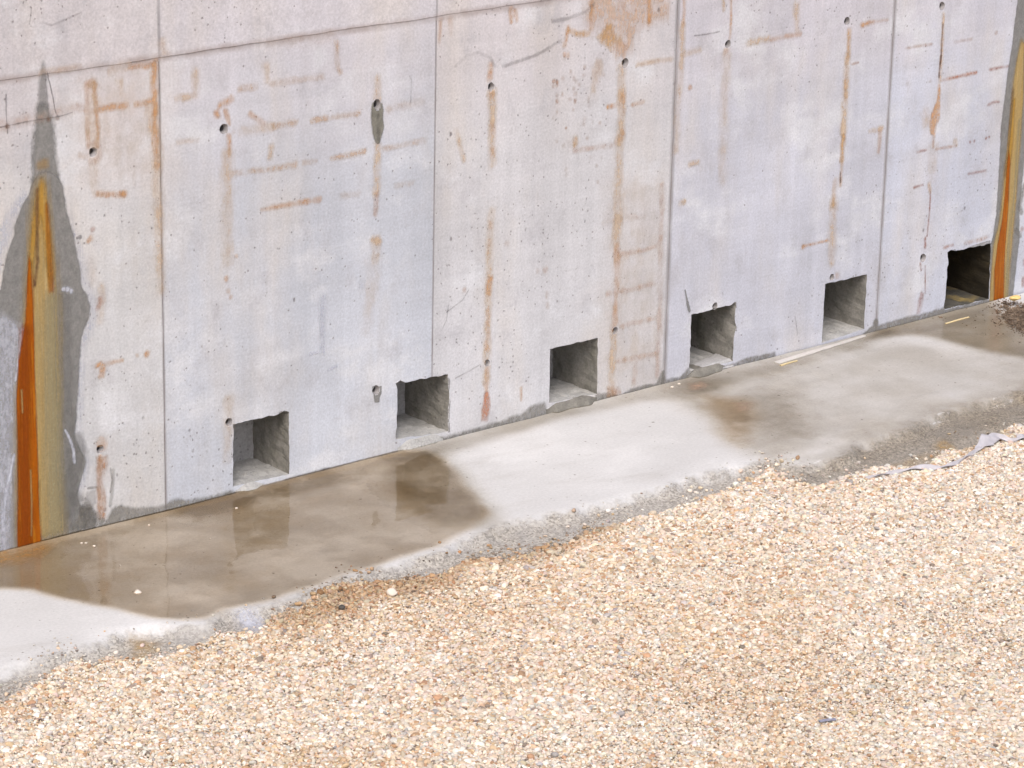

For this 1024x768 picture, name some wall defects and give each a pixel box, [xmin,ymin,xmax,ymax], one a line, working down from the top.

corrosion [147,62,157,154]
corrosion [589,0,666,54]
corrosion [989,42,1024,302]
corrosion [0,182,63,563]
water stain [0,104,234,552]